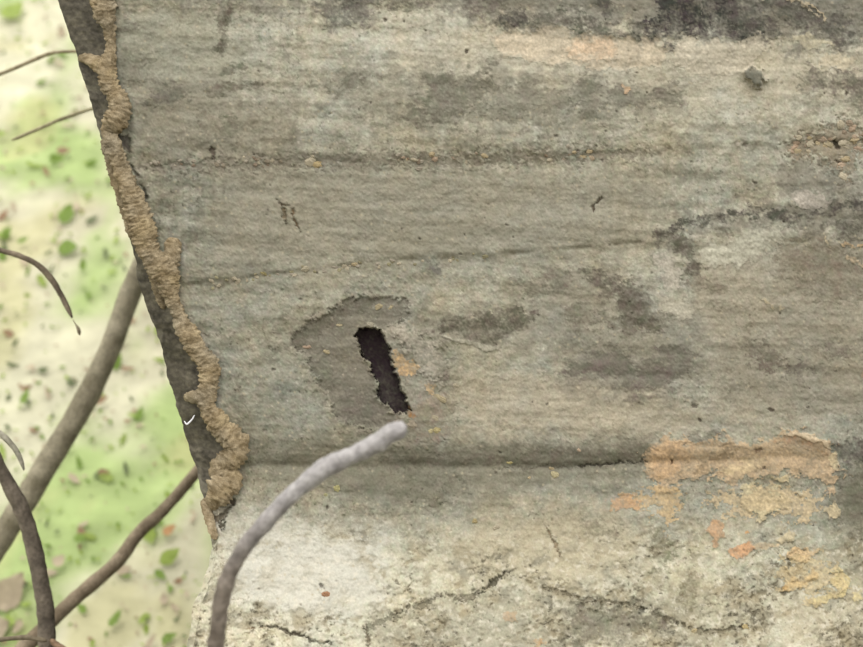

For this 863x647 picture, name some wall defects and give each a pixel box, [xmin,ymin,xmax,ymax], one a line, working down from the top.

water stain [116,42,192,113]
water stain [194,0,263,98]
water stain [324,72,369,100]
water stain [311,0,434,34]
water stain [397,54,689,133]
water stain [461,0,863,119]
water stain [428,188,863,407]
spalling [282,284,467,460]
flaking render [823,500,841,519]
crack [247,625,332,645]
crack [363,571,510,647]
crack [542,585,749,635]